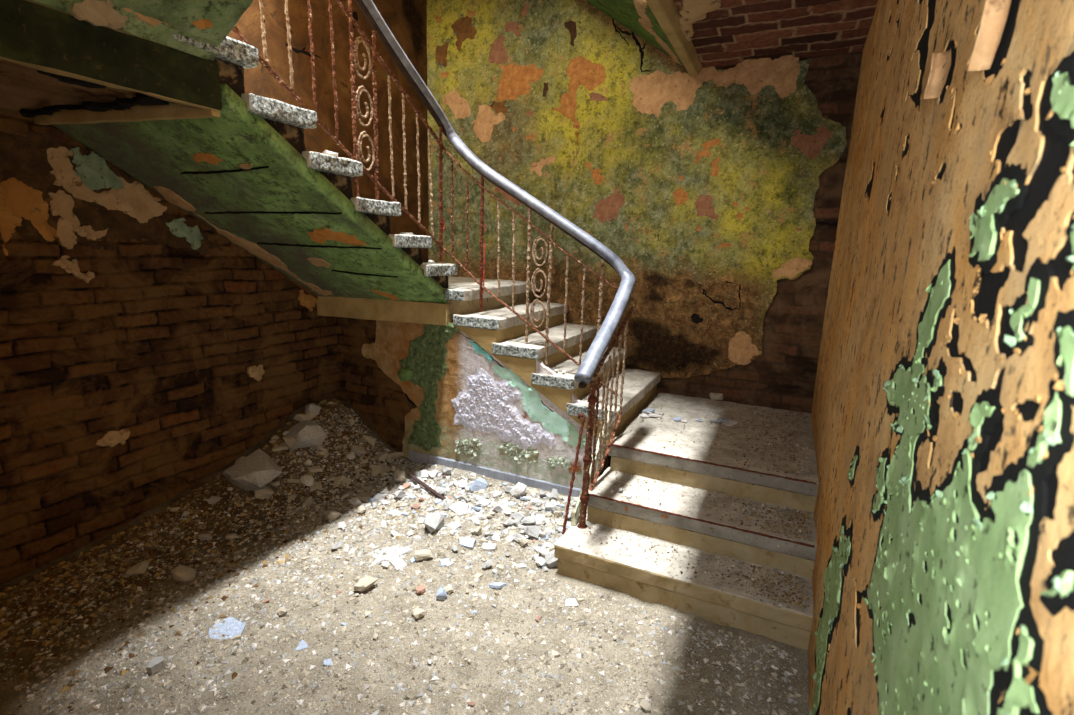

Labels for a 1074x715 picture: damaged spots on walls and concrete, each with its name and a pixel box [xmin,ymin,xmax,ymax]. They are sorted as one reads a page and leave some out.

peeling [70,0,168,30]
peeling [630,55,800,118]
spalling [923,0,1020,104]
peeling [147,186,333,311]
peeling [399,322,460,452]
peeling [451,340,586,471]
leakage [645,274,668,301]
leakage [630,319,719,372]
crack [702,281,742,311]
peeling [728,331,762,365]
peeling [862,51,1074,715]
peeling [809,515,853,715]